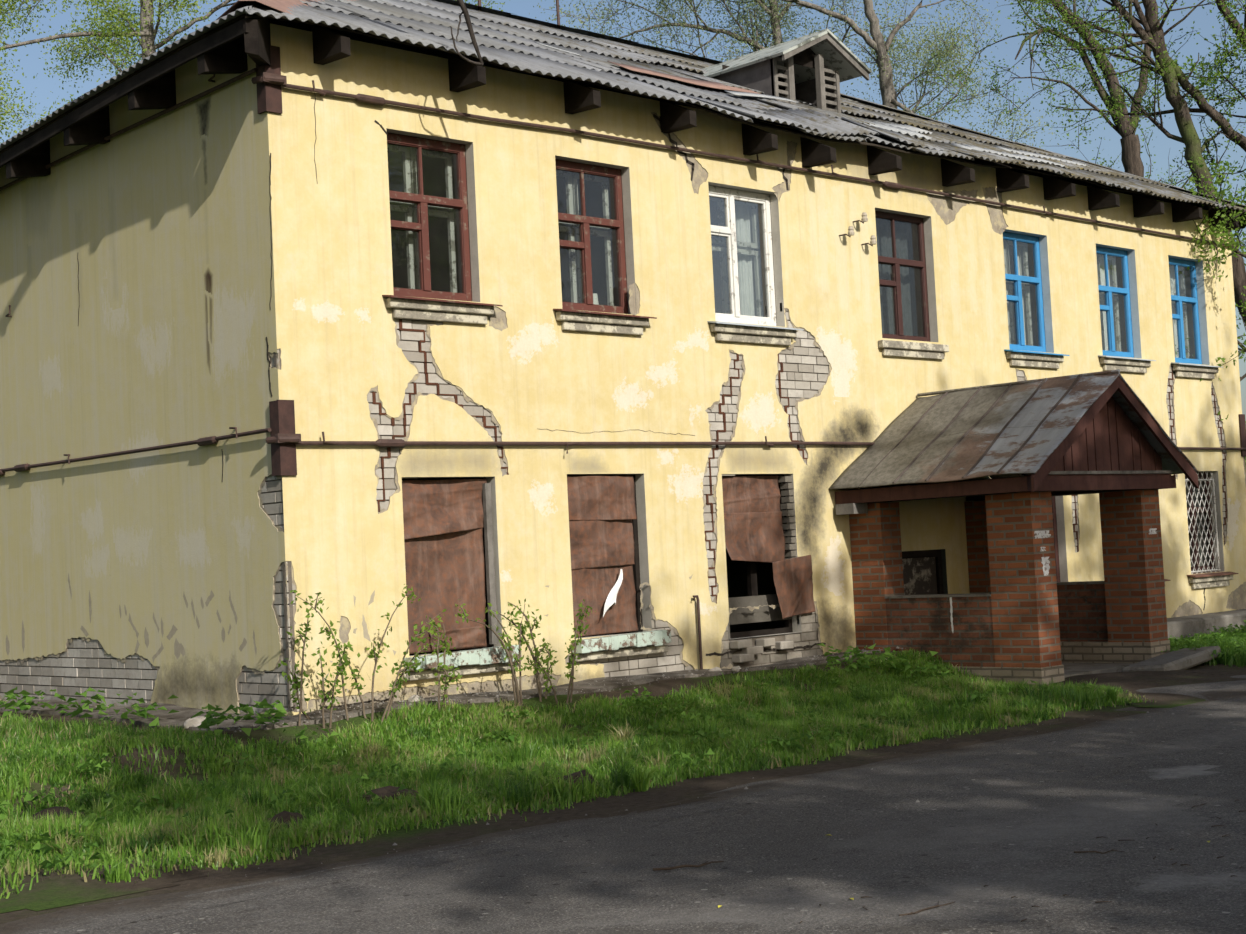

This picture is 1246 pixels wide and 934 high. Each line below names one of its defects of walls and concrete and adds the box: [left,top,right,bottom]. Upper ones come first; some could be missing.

flaking render [651,112,708,194]
flaking render [926,187,1008,235]
peeling [120,421,167,491]
peeling [228,474,284,564]
flaking render [367,319,509,514]
peeling [523,477,560,520]
peeling [607,303,860,669]
flaking render [0,493,214,707]
peeling [183,590,238,643]
flaking render [236,561,694,714]